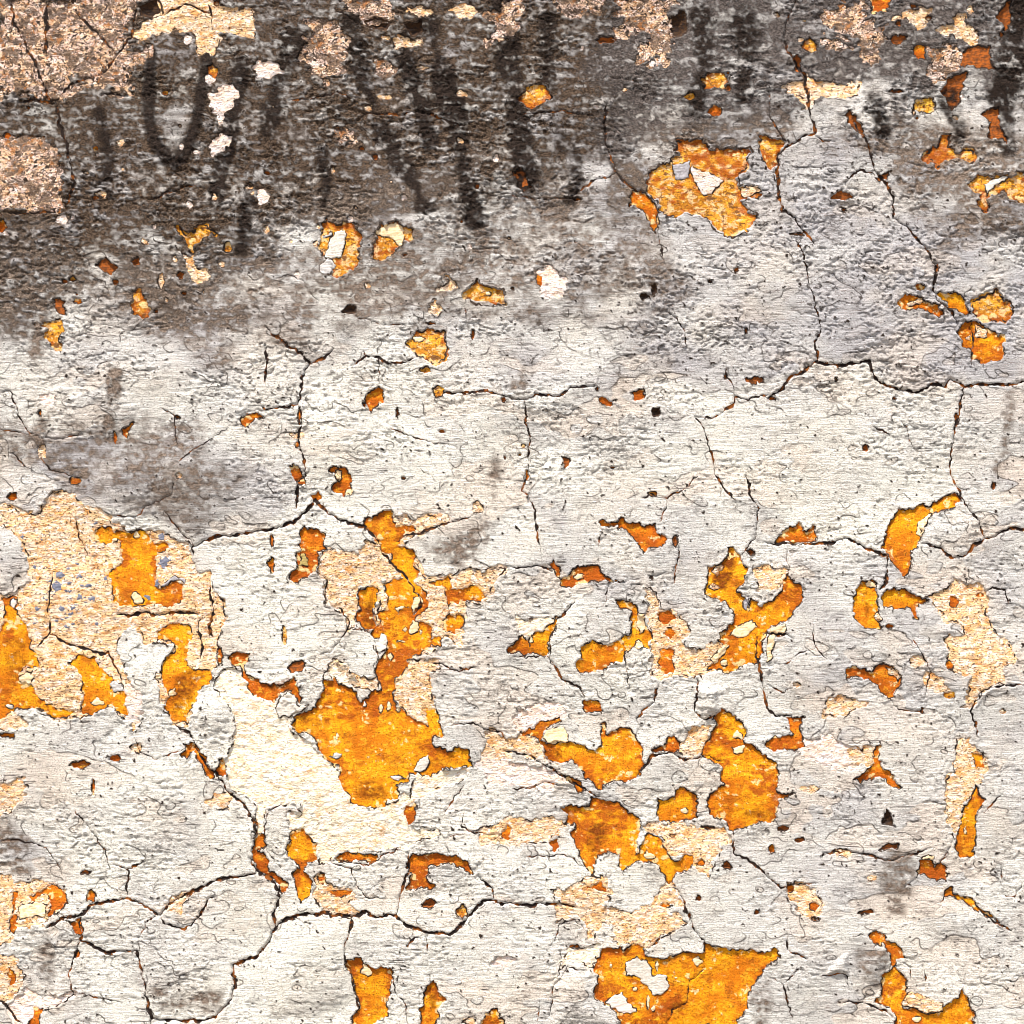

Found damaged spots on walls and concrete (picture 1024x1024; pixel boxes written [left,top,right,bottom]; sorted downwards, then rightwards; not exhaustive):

damp [0,0,1024,365]
crack [643,1,1024,590]
damp [0,368,241,529]
crack [111,327,477,615]
crack [443,385,590,570]
damp [993,391,1014,472]
crack [0,722,599,1024]
peeling [138,510,511,910]
peeling [520,700,806,914]
peeling [557,922,781,1024]
peeling [576,547,804,679]
peeling [845,492,1003,707]